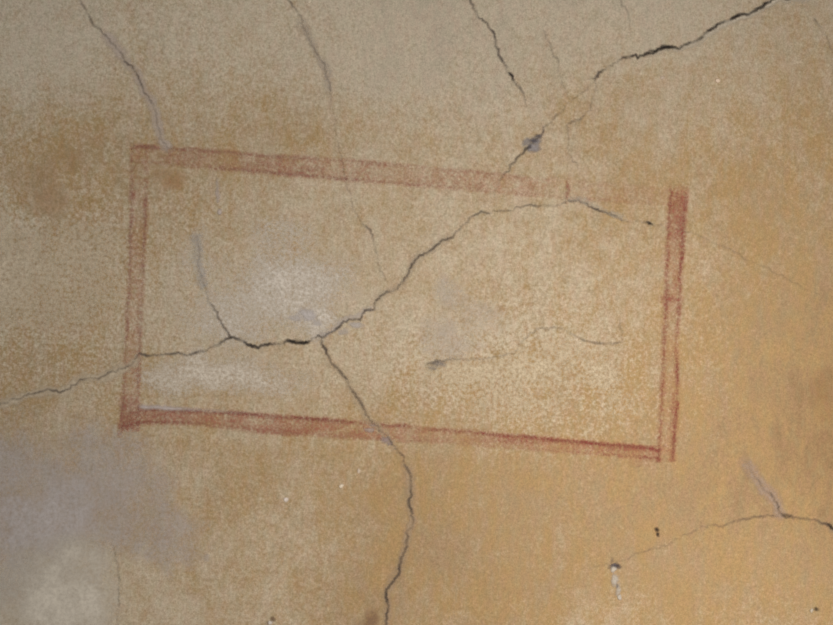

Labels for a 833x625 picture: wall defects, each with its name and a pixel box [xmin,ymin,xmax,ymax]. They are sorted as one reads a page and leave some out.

crack [623,0,809,59]
crack [92,22,172,149]
crack [404,239,448,280]
crack [0,354,149,408]
crack [218,292,385,403]
crack [384,471,416,623]